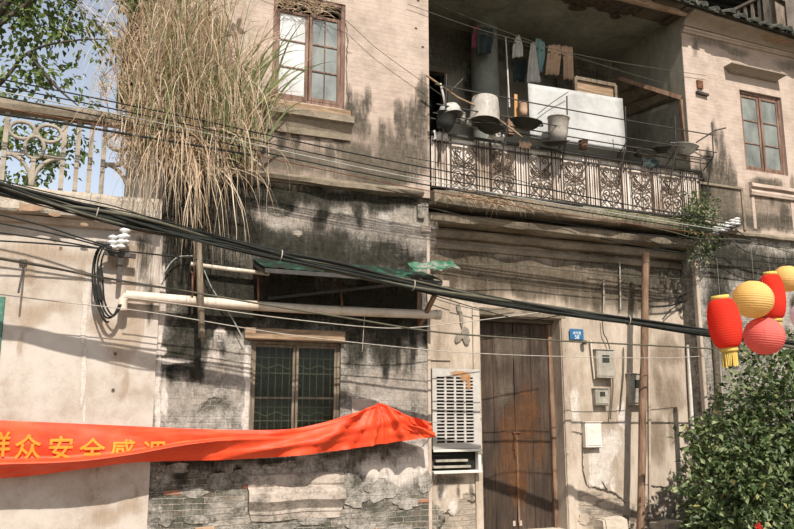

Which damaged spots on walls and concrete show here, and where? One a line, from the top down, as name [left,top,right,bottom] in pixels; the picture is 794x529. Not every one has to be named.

flaking render [562,0,643,20]
leakage [428,25,471,100]
leakage [498,39,530,69]
leakage [543,53,611,90]
leakage [158,78,682,312]
leakage [695,125,794,231]
leakage [137,238,151,272]
leakage [146,236,428,430]
corrosion [453,371,471,389]
flaking render [148,462,476,529]
crack [572,431,626,503]
flaking render [578,477,692,526]